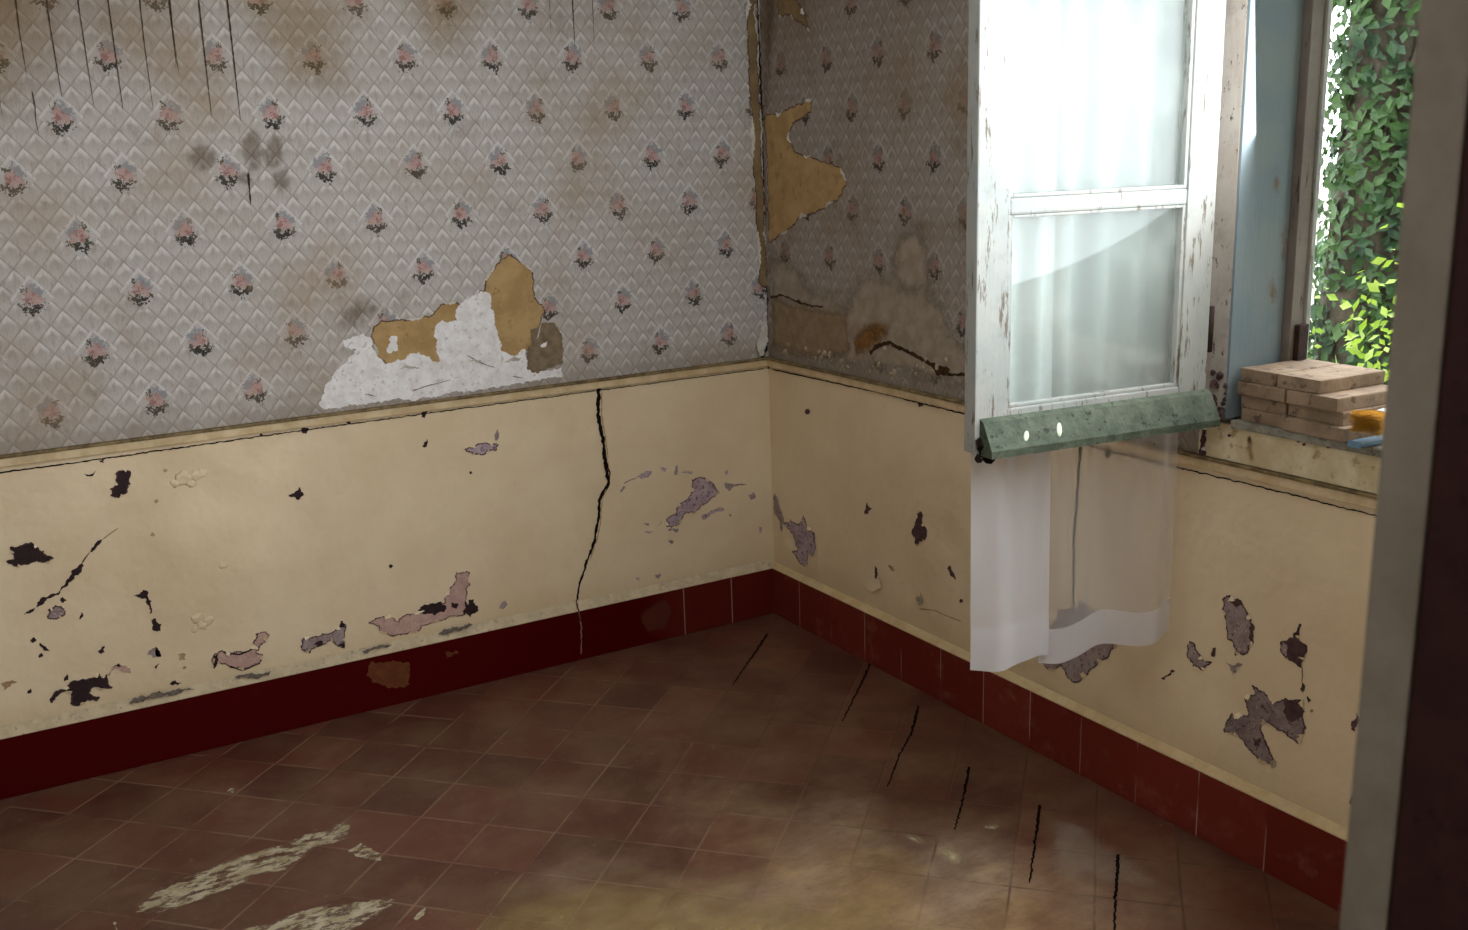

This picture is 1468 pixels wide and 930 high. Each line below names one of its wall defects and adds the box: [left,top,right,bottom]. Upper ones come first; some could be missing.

water stain [107,0,123,107]
water stain [168,0,179,72]
water stain [198,0,212,115]
water stain [226,0,241,121]
flaking render [319,268,564,423]
crack [0,0,965,653]
peeling [6,542,54,568]
crack [1072,445,1376,610]
peeling [49,646,131,706]
crack [887,706,919,787]
crack [954,767,970,830]
peeling [1223,623,1313,769]